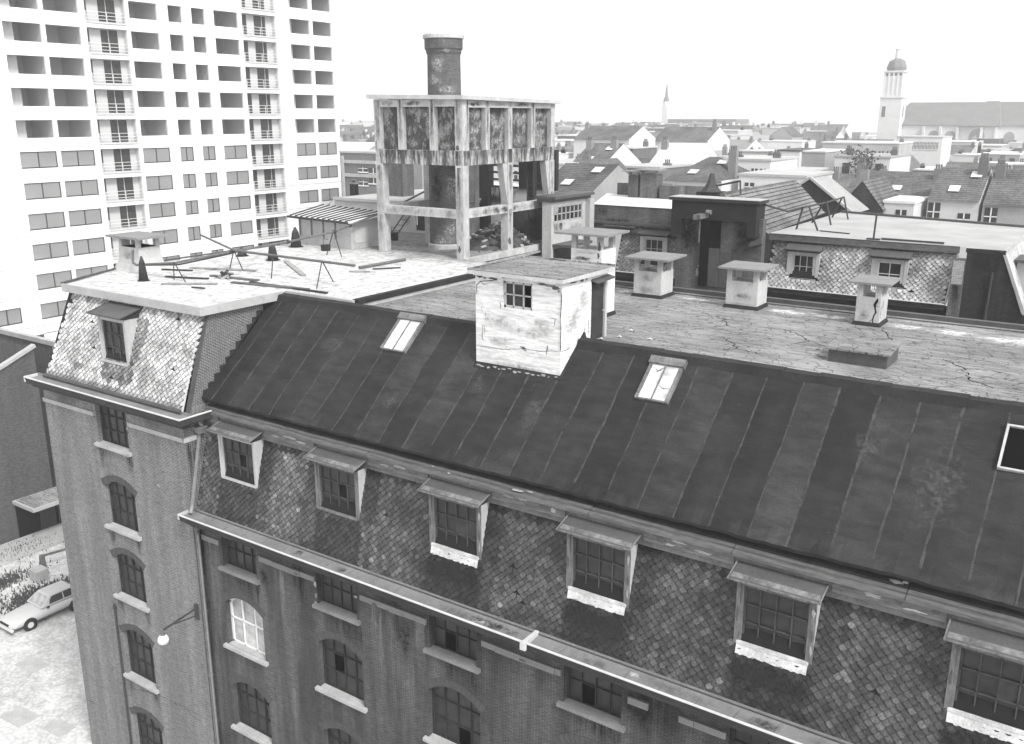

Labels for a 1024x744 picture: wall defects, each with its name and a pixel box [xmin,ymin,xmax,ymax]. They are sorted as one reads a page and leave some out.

crack [706,313,825,354]
crack [869,298,913,340]
crack [943,359,1013,388]